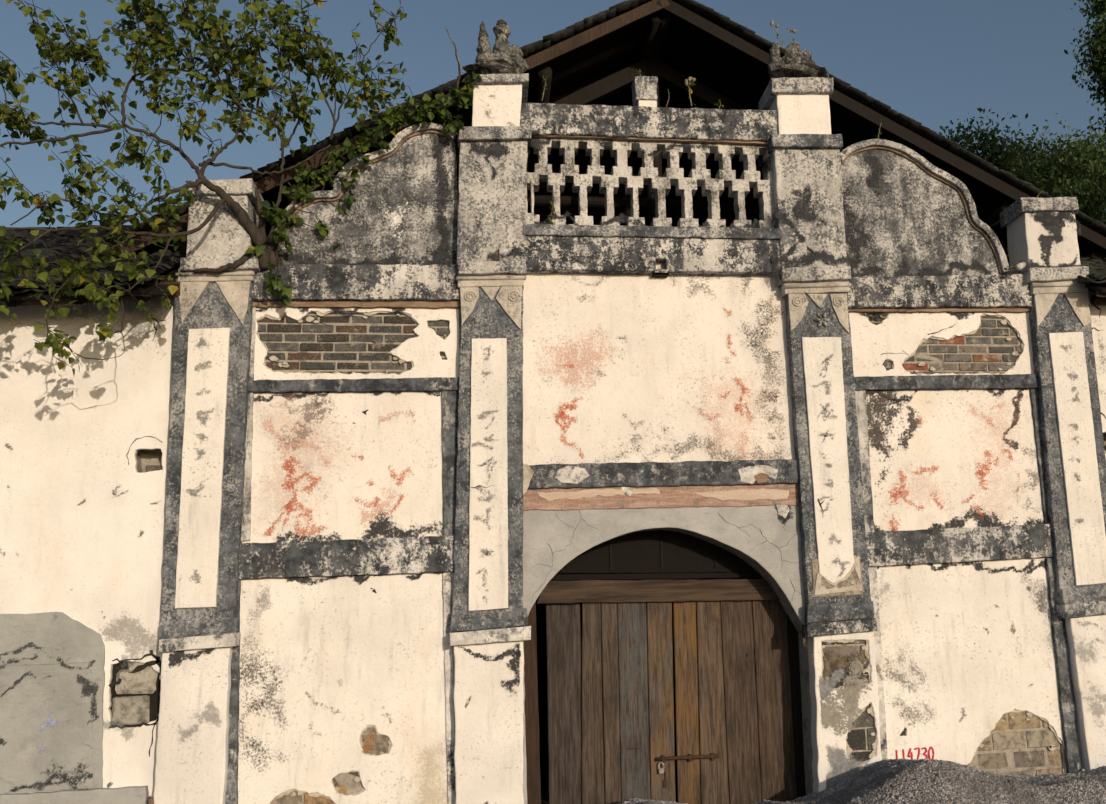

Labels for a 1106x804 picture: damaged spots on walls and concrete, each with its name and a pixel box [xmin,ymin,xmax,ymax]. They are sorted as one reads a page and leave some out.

water stain [595,140,714,157]
water stain [278,134,457,265]
water stain [602,212,646,226]
water stain [609,151,992,462]
flaking render [256,309,450,375]
flaking render [882,314,1024,375]
spalling [126,436,163,473]
crack [531,510,597,602]
crack [718,513,803,600]
flaking render [108,650,162,757]
flaking render [967,709,1065,776]
flaking render [270,770,365,804]